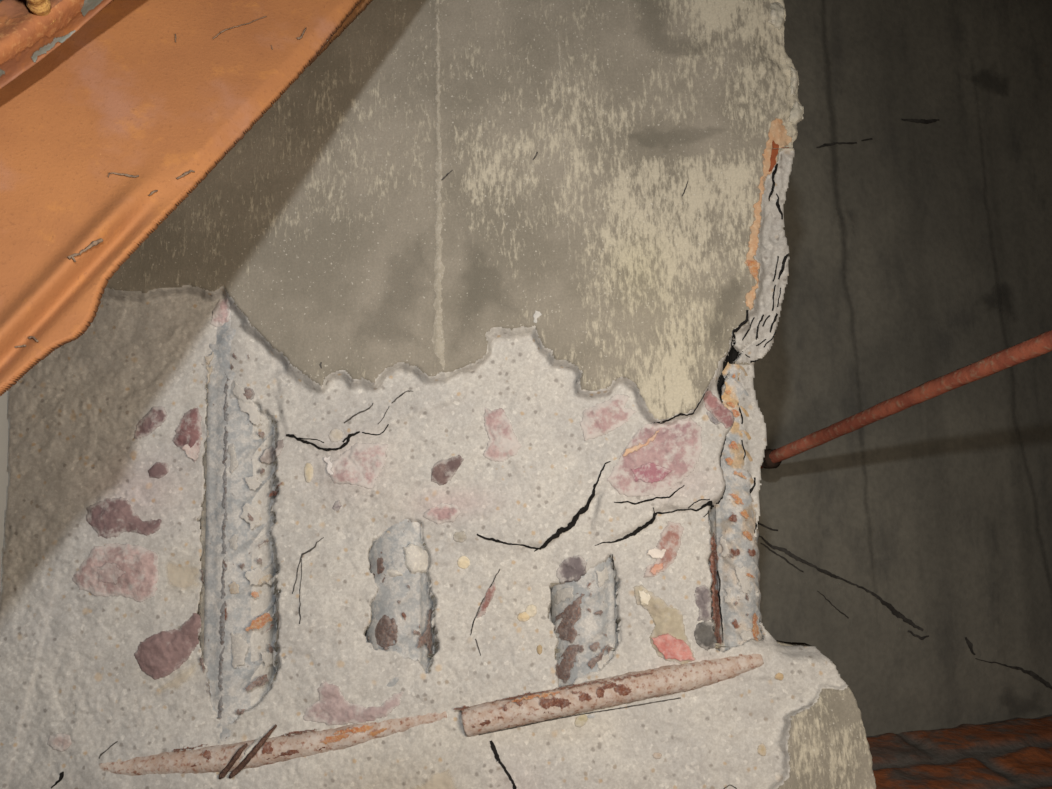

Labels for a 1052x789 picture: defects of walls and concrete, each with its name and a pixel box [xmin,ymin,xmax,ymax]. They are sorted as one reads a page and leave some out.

rust [0,0,85,65]
rust [745,118,792,310]
crack [769,164,783,219]
crack [286,390,413,451]
spalling [0,150,848,789]
crack [477,254,789,570]
rust [368,600,406,650]
rust [472,583,653,728]
rust [709,493,759,648]
crack [754,522,929,640]
rust [262,725,387,760]
crack [479,697,681,789]